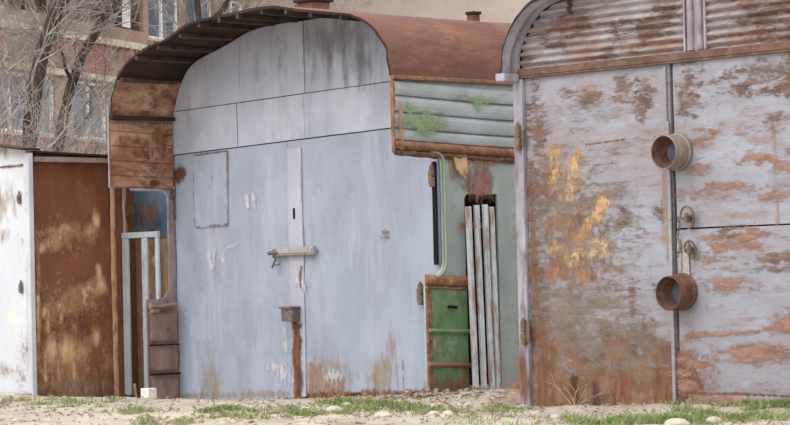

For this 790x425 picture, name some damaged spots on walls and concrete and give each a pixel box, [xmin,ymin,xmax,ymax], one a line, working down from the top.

corrosion [538,0,594,50]
corrosion [610,4,680,42]
corrosion [494,76,790,407]
corrosion [179,321,469,399]